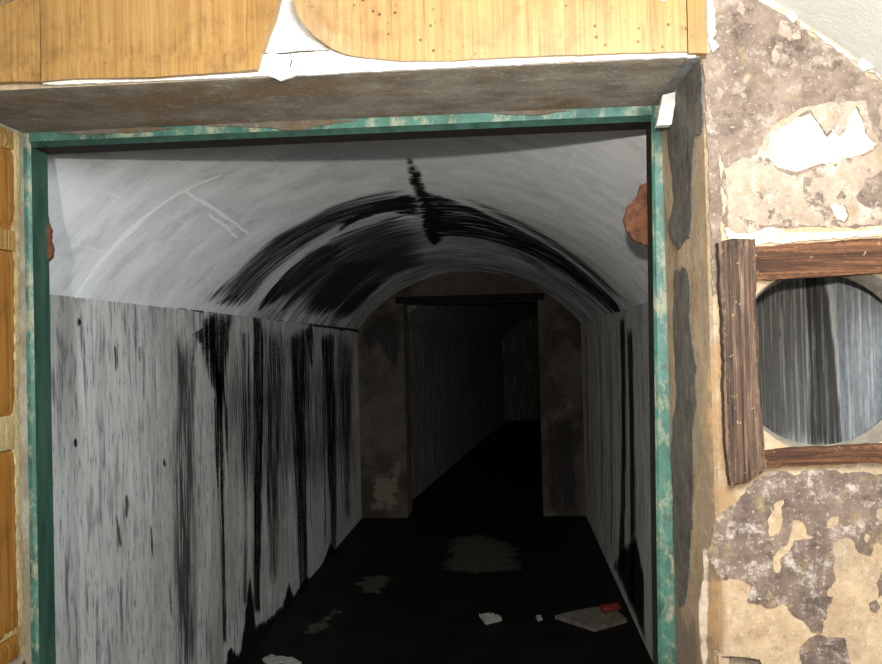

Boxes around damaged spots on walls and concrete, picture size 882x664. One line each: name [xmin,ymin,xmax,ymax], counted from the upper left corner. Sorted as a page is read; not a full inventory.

peeling [42,0,882,296]
water stain [170,344,195,664]
water stain [196,159,645,664]
peeling [670,266,697,664]
peeling [707,469,882,664]